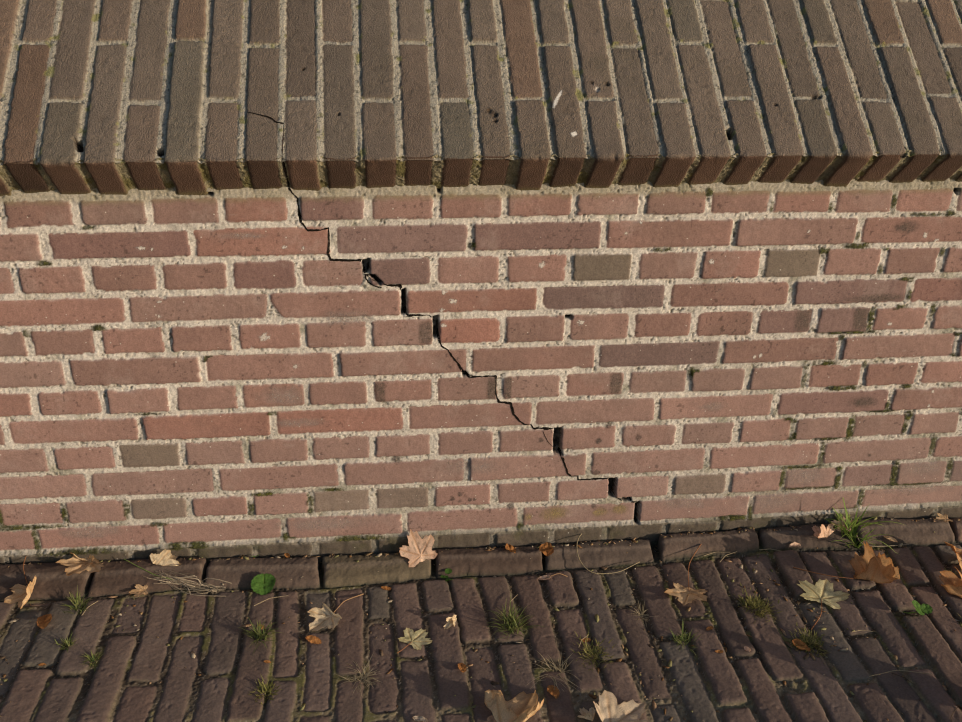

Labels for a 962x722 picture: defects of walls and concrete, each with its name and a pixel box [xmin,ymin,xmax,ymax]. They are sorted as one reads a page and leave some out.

crack [248,112,639,522]